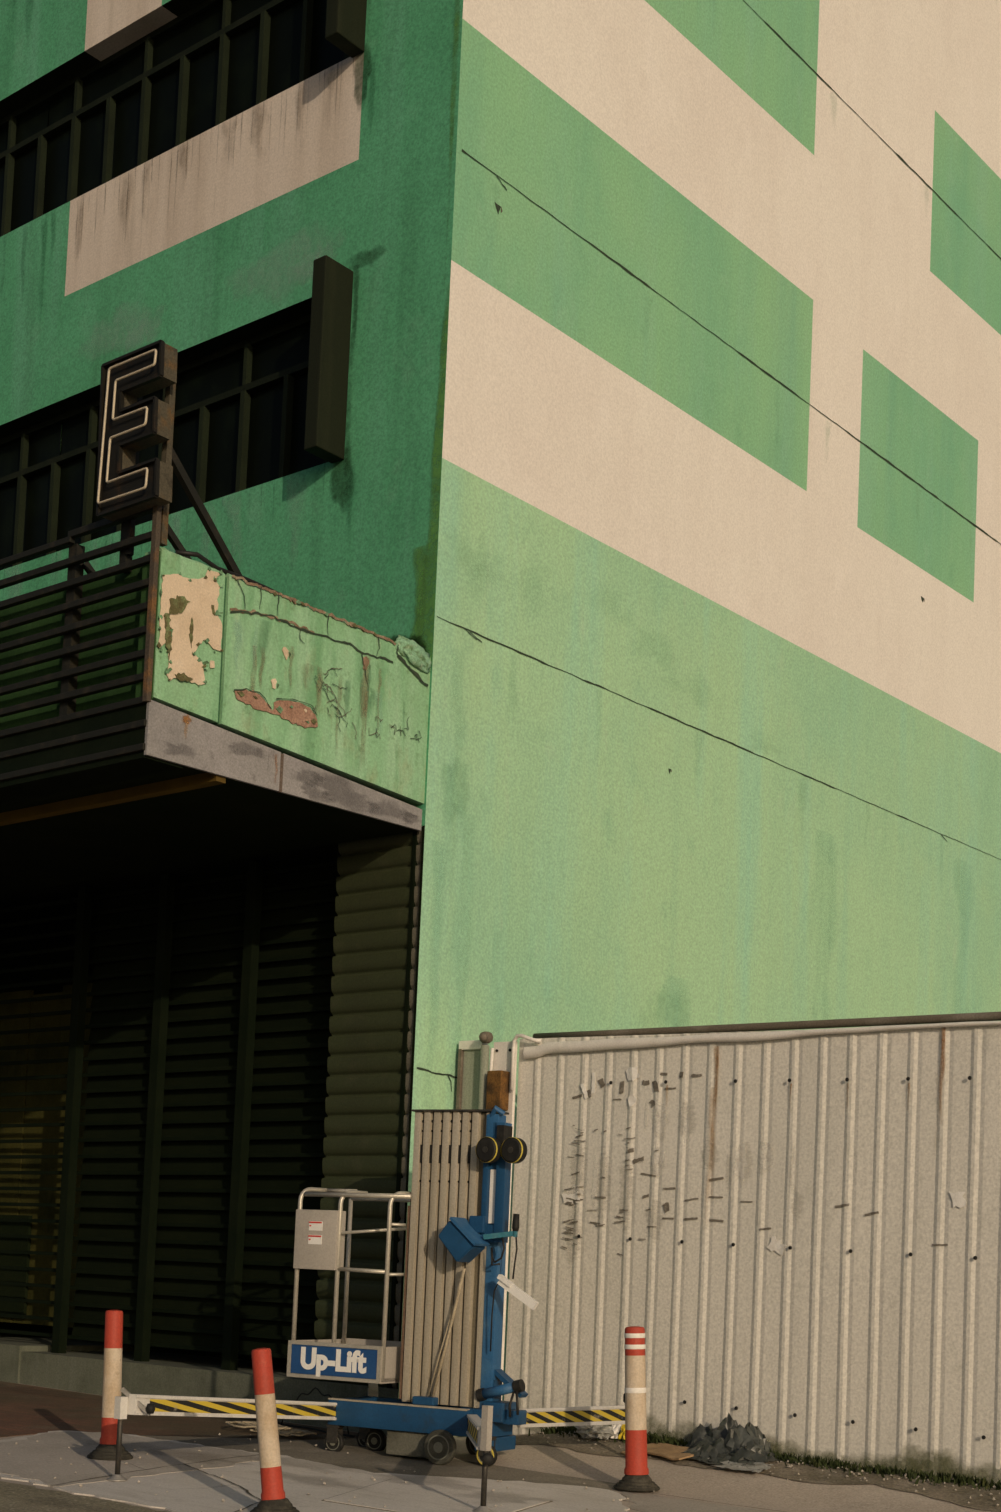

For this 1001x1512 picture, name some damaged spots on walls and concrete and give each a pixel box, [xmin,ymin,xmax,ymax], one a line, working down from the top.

peeling [156,566,396,686]
spalling [234,678,318,728]